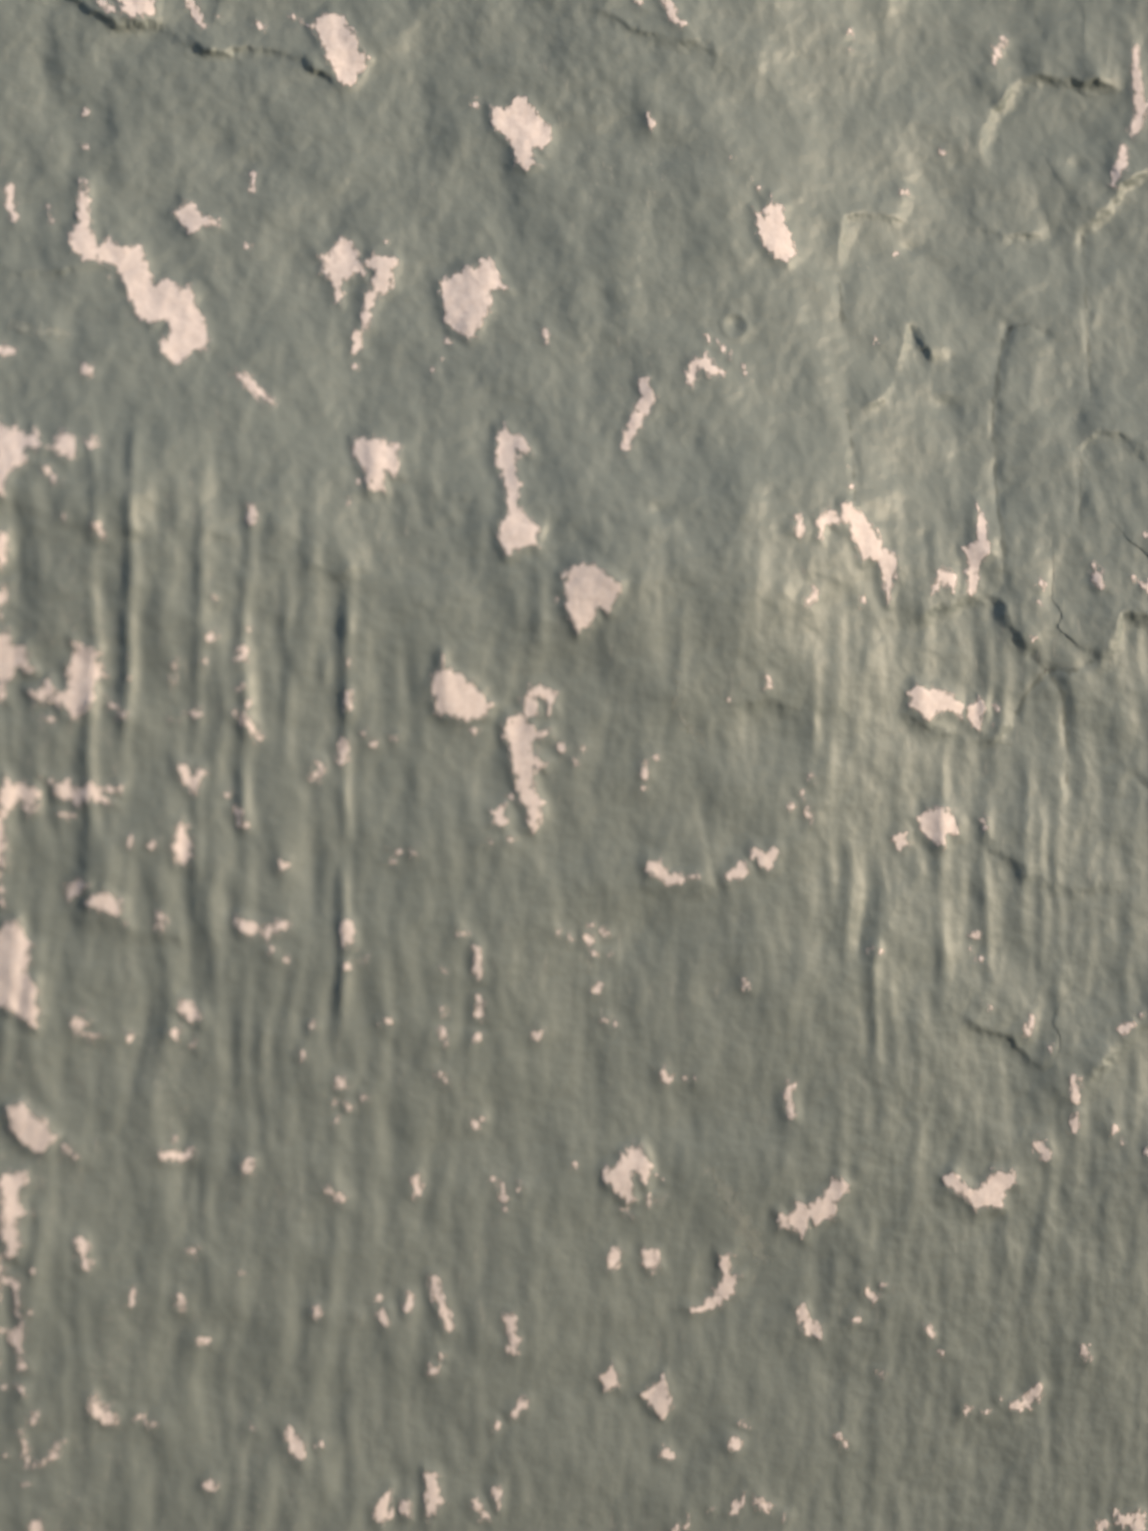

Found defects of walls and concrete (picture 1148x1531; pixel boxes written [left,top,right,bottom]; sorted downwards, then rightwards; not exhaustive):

peeling [291,13,370,87]
peeling [473,96,551,171]
peeling [68,179,208,364]
peeling [431,257,507,372]
peeling [755,186,796,262]
peeling [0,532,126,723]
peeling [556,563,621,634]
peeling [795,484,897,604]
peeling [431,654,585,844]
peeling [906,685,1000,731]
peeling [0,778,125,1029]
peeling [942,1168,1017,1213]